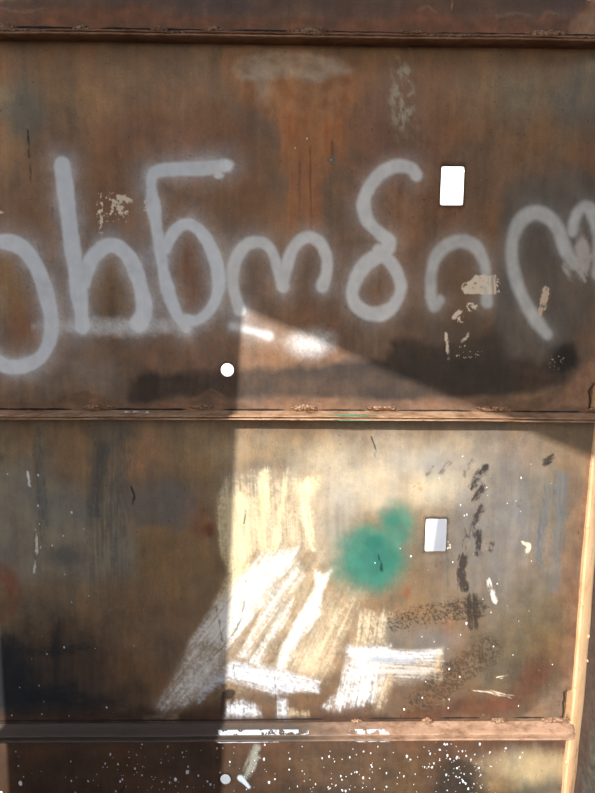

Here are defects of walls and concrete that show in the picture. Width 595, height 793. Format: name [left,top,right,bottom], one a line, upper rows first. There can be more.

rust [565,0,595,34]
rust [215,48,372,218]
peeling [96,191,150,235]
peeling [451,274,500,323]
peeling [537,285,551,318]
peeling [444,331,482,361]